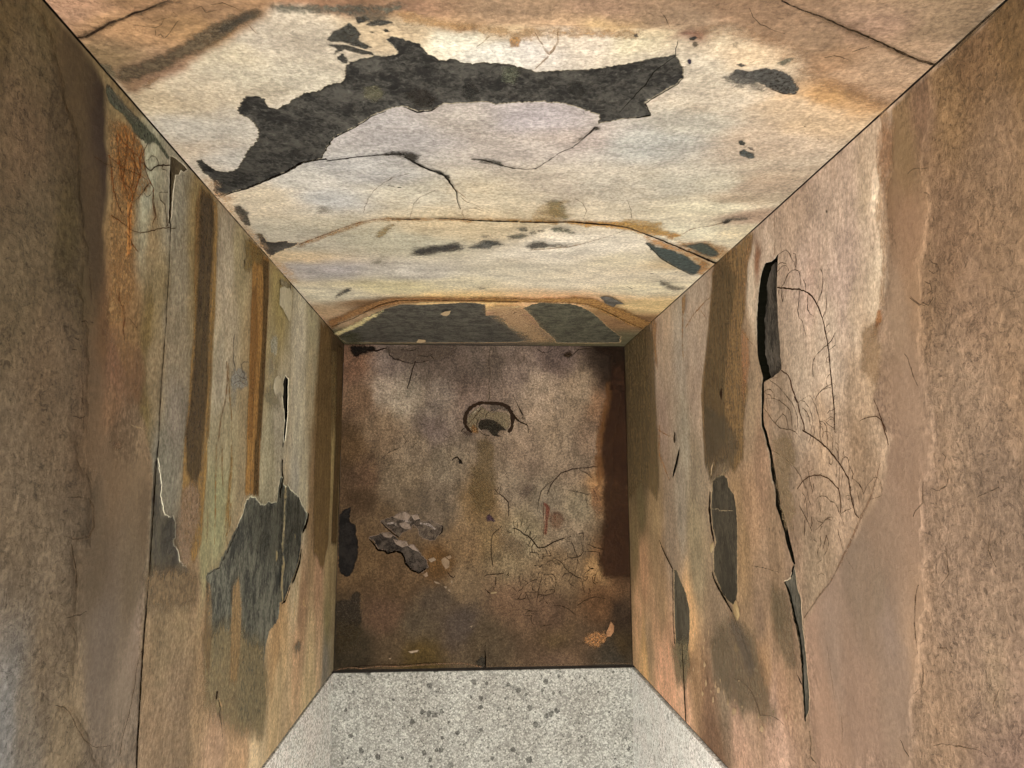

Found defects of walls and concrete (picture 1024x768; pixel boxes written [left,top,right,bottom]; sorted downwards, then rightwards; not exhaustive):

rust [108,120,156,340]
leakage [176,187,218,564]
crack [327,152,480,217]
spalling [168,16,698,257]
spalling [337,302,621,344]
leakage [314,297,658,570]
crack [472,127,600,170]
spalling [723,58,799,95]
crack [751,250,889,575]
spalling [146,458,309,738]
crack [484,466,605,626]
spalling [708,464,740,629]